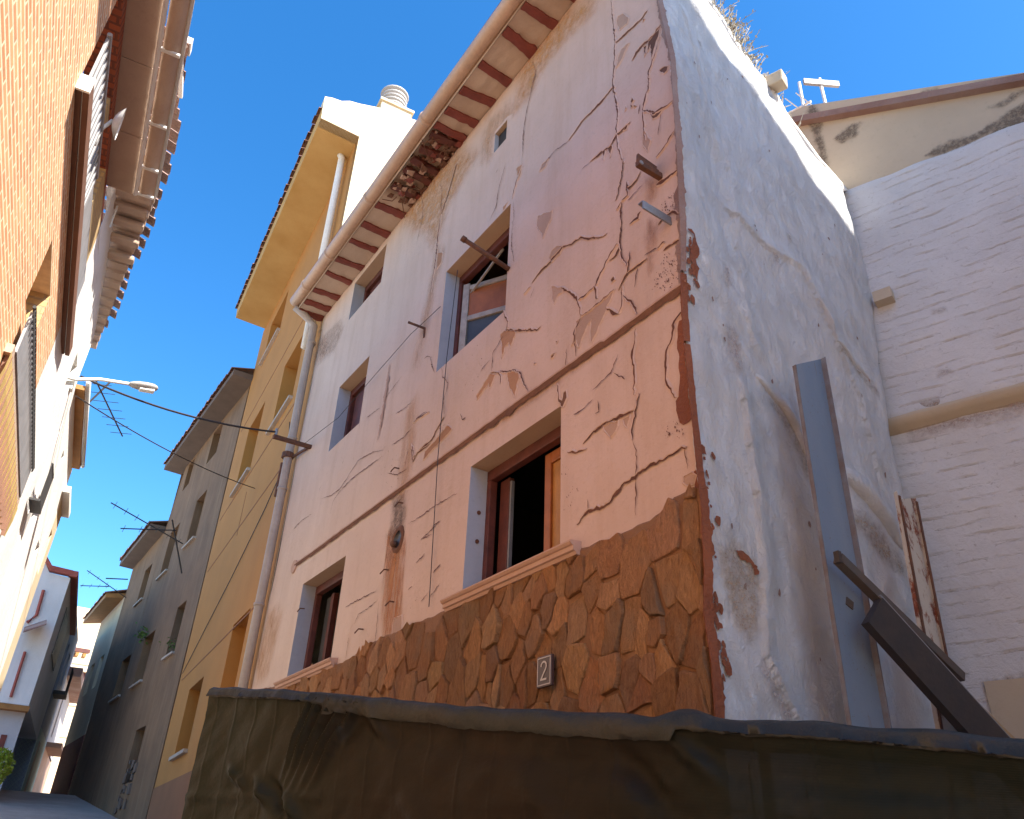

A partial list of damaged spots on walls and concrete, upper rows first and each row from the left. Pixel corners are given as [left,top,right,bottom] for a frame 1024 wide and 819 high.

crack [418,165,456,293]
crack [482,0,688,525]
crack [294,356,465,529]
corrosion [294,285,681,566]
flaking render [642,0,733,719]
corrosion [384,533,403,635]
crack [408,494,456,601]
spalling [736,550,759,590]